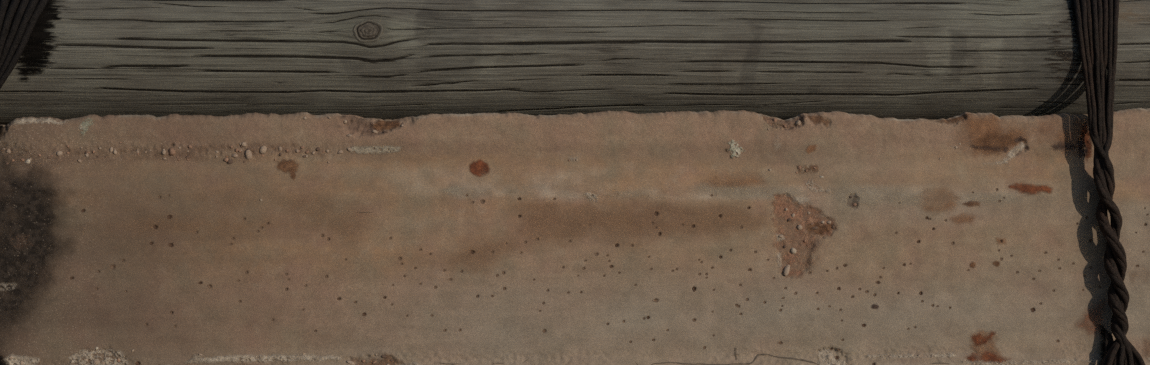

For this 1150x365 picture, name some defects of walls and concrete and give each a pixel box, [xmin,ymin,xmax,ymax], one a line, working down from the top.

corrosion [470,160,489,176]
corrosion [1009,184,1052,194]
spalling [773,195,835,276]
corrosion [968,332,1005,363]